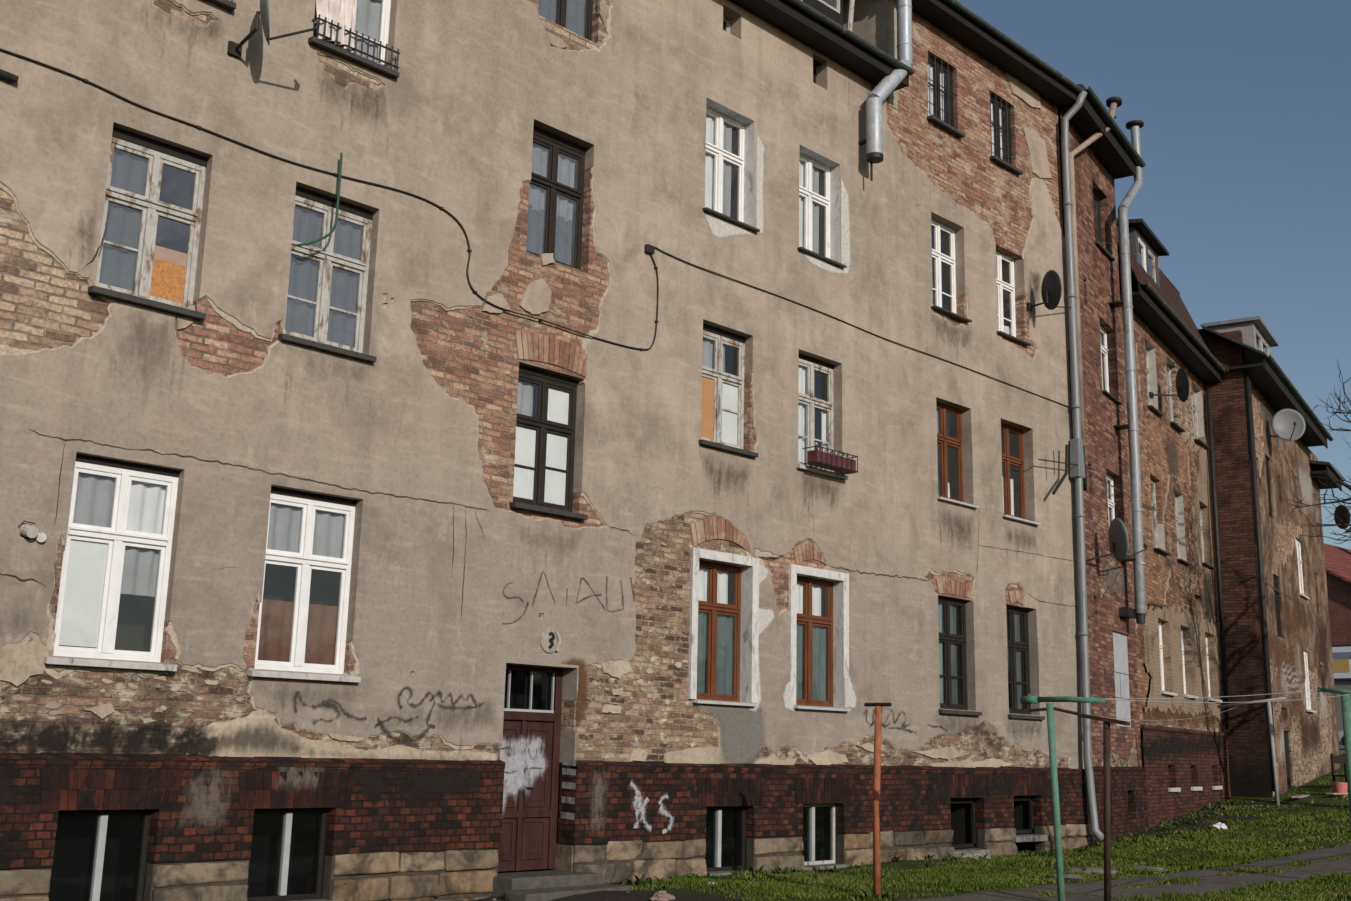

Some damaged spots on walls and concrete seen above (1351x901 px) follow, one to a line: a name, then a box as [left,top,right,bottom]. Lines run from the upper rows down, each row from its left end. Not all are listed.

flaking render [523,0,613,52]
flaking render [886,11,1063,261]
flaking render [0,181,114,356]
flaking render [174,295,284,379]
flaking render [382,166,613,530]
crack [29,429,489,620]
flaking render [0,533,502,761]
flaking render [561,510,829,764]
flaking render [746,720,1071,768]